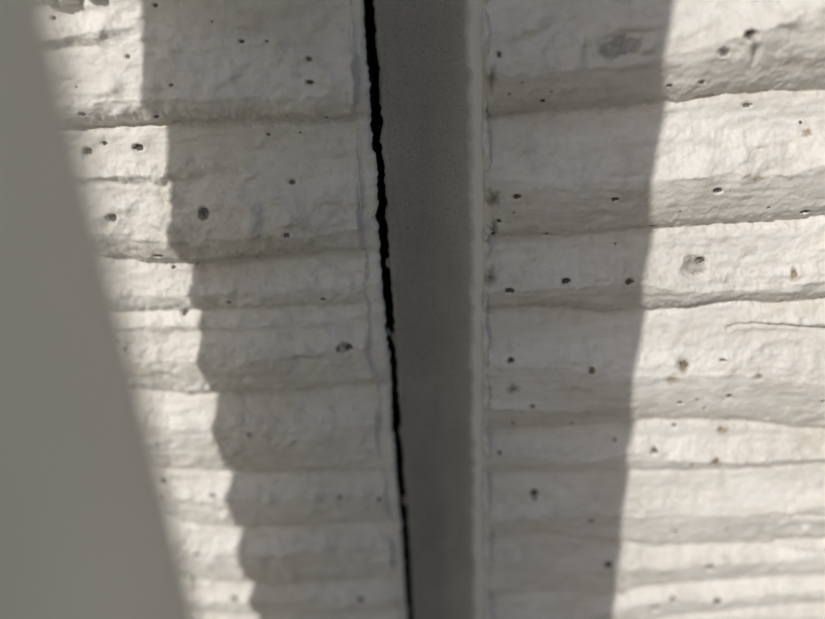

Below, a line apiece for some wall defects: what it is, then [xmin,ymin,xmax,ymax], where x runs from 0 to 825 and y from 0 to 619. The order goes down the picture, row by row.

crack [363,0,414,619]